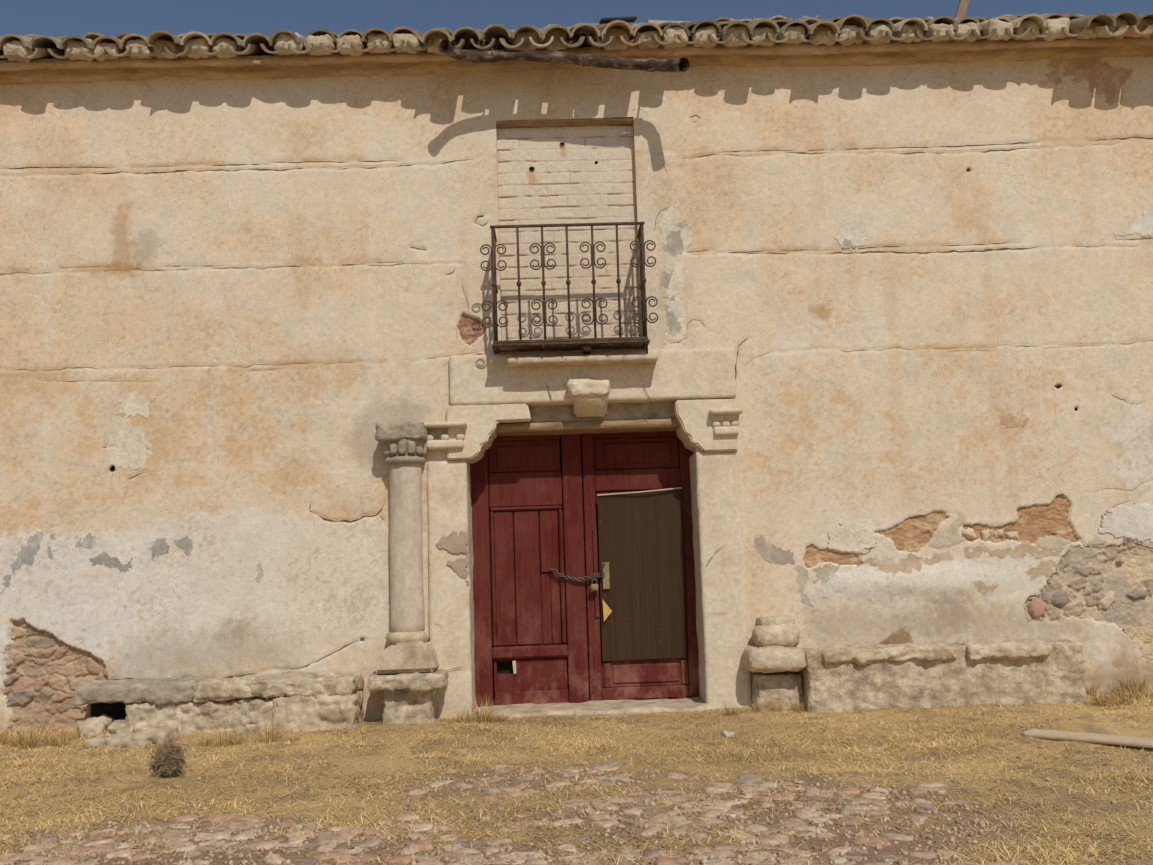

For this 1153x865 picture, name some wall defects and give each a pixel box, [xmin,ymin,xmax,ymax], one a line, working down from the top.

crack [0,159,469,175]
crack [691,238,1151,255]
peeling [657,203,695,345]
spalling [458,315,487,345]
peeling [0,531,57,593]
peeling [75,533,136,572]
peeling [148,536,193,561]
peeling [435,531,470,585]
spalling [754,496,1153,663]
spalling [3,619,108,733]